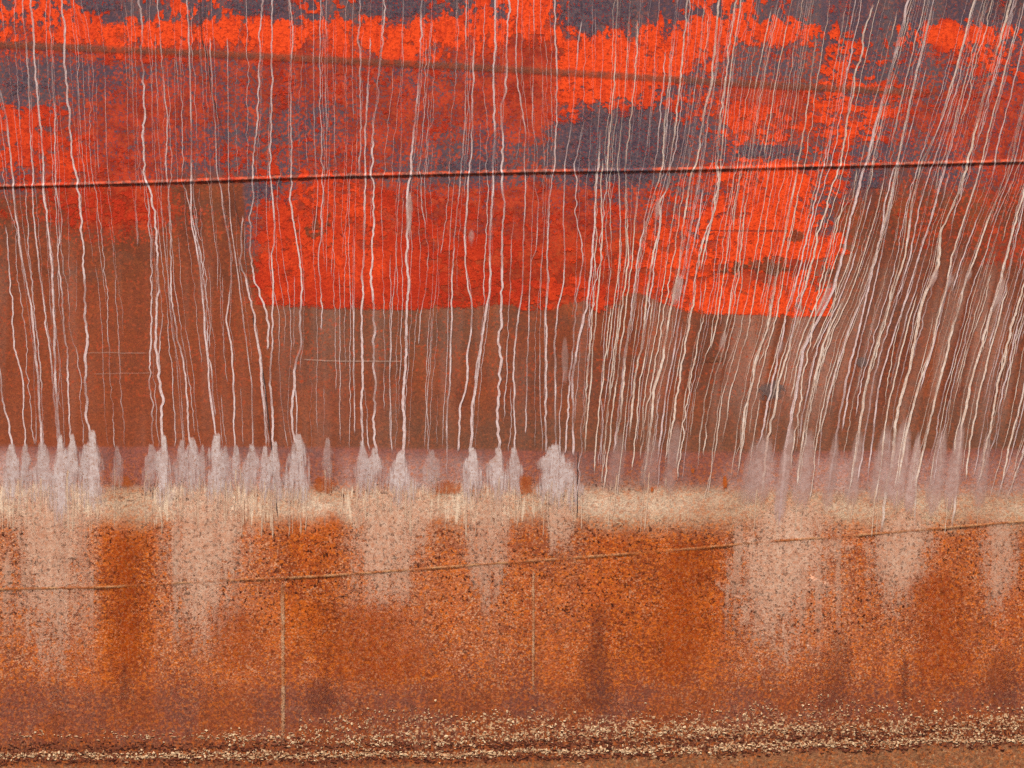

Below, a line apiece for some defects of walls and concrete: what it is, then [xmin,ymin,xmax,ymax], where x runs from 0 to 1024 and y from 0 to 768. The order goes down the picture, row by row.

leakage [0,0,115,674]
leakage [96,195,119,343]
leakage [141,24,310,654]
leakage [314,71,446,611]
leakage [441,0,1024,665]